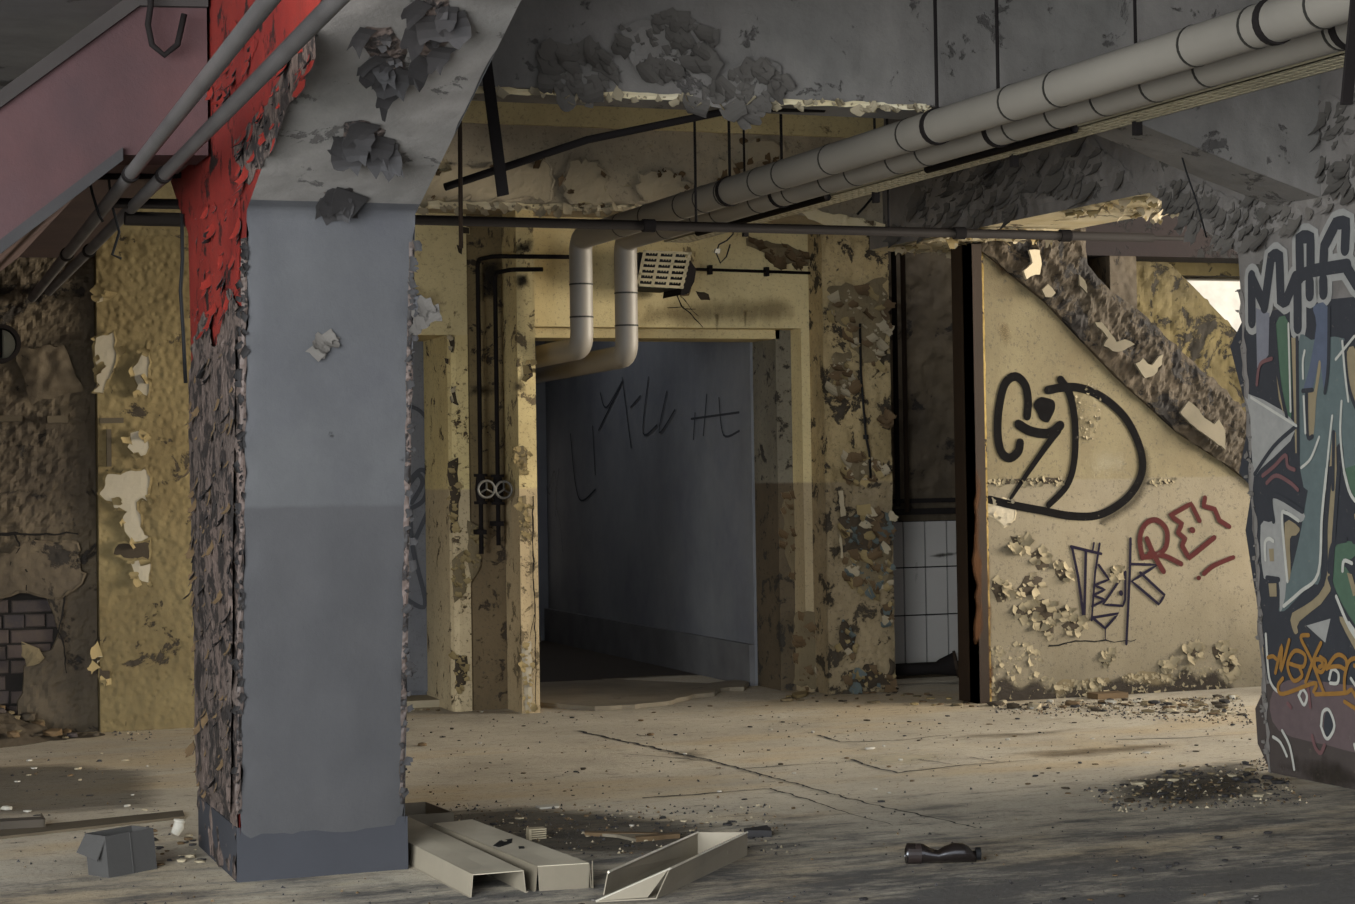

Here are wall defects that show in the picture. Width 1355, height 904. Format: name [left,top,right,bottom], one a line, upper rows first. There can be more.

peeling [315,0,472,226]
flaking render [416,155,694,255]
peeling [475,7,932,181]
peeling [883,94,1355,259]
flaking render [91,330,152,398]
peeling [181,36,316,815]
peeling [825,277,896,403]
peeling [1075,382,1102,445]
flaking render [0,599,57,715]
flaking render [96,429,154,587]
peeling [446,458,485,603]
peeling [987,476,1242,699]